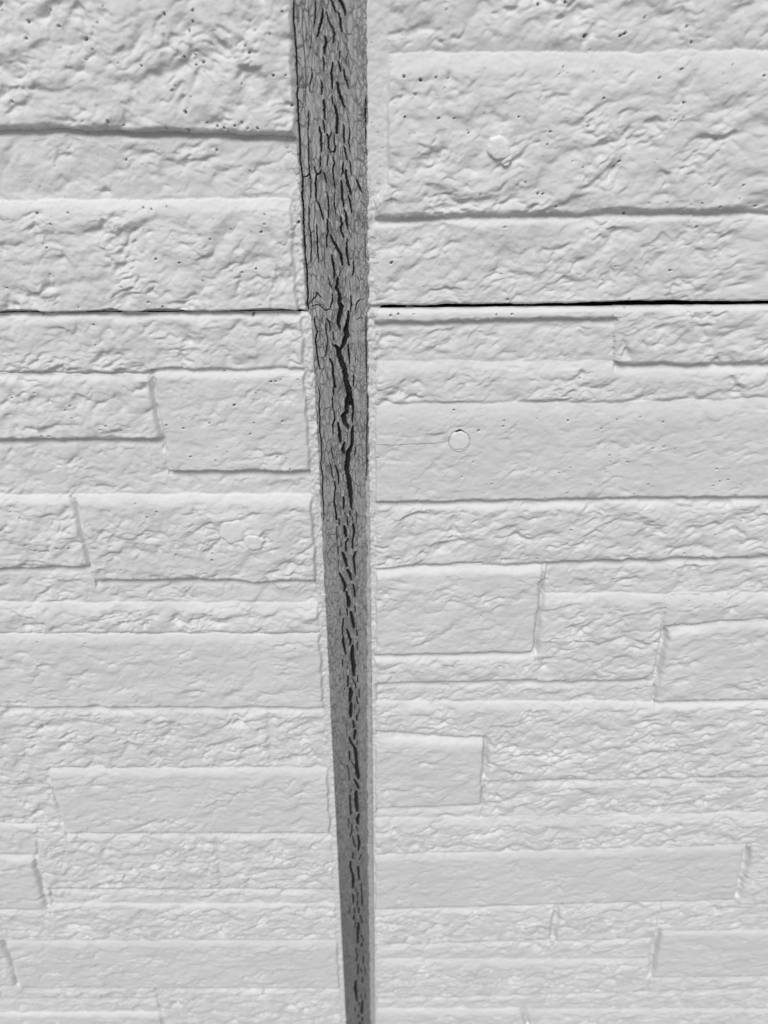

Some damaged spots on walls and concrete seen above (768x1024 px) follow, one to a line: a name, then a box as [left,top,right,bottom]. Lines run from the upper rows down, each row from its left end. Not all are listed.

crack [293,0,450,1024]